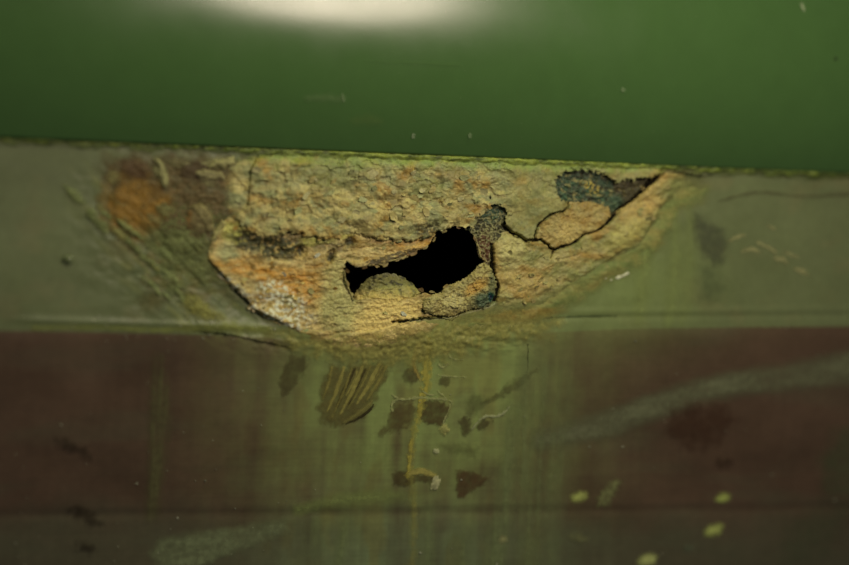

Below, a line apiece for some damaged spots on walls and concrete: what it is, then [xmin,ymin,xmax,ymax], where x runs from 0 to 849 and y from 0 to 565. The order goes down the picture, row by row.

peeling [227,152,694,312]
crack [491,171,712,301]